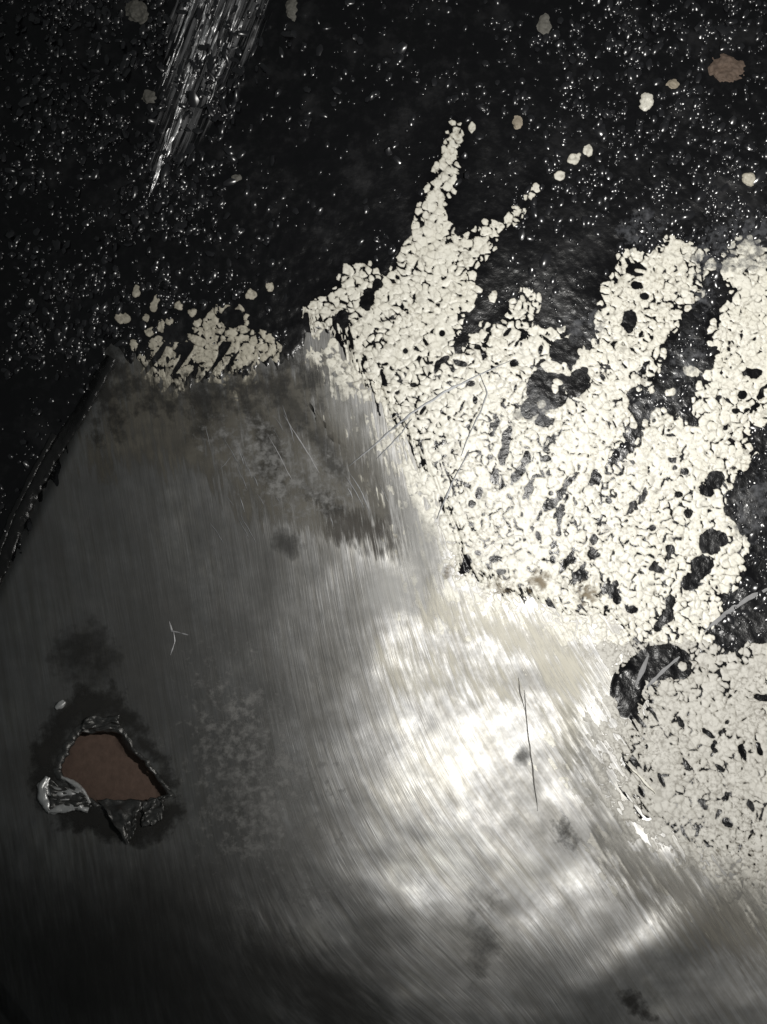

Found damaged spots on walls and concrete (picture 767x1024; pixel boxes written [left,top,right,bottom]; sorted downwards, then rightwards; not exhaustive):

damp [189,672,331,901]
damp [376,641,522,706]